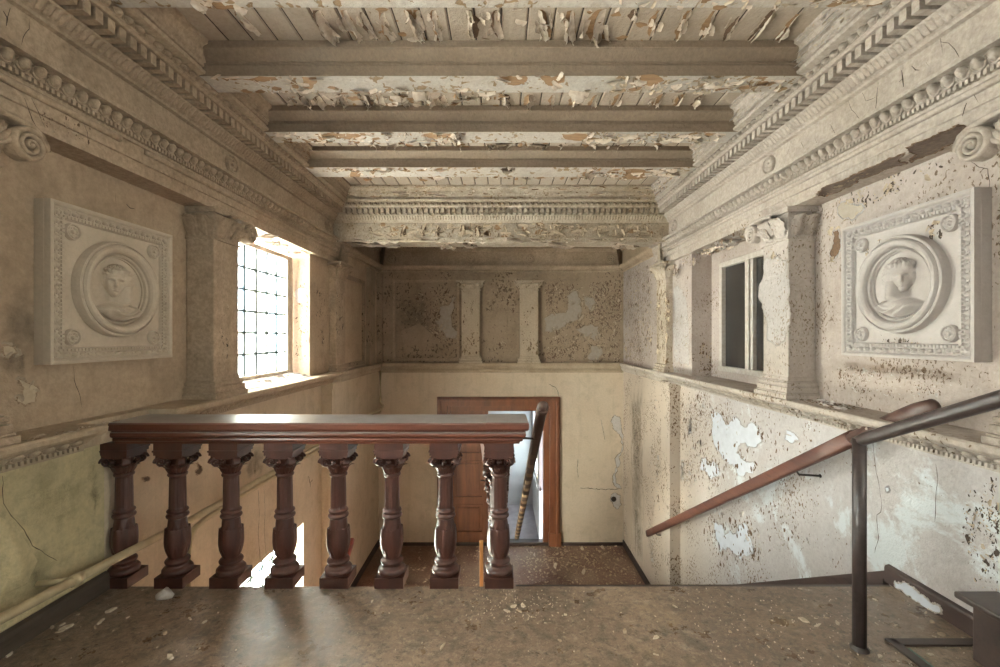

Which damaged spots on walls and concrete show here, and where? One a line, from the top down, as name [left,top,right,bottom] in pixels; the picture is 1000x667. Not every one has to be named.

peeling [514,0,753,48]
peeling [211,72,598,111]
peeling [275,132,469,153]
peeling [486,132,726,162]
spalling [813,124,966,210]
peeling [352,223,653,250]
spalling [544,222,749,371]
spalling [680,393,800,497]
crack [2,476,57,561]
spalling [701,502,818,568]
peeling [962,477,1000,591]
spalling [893,581,943,615]